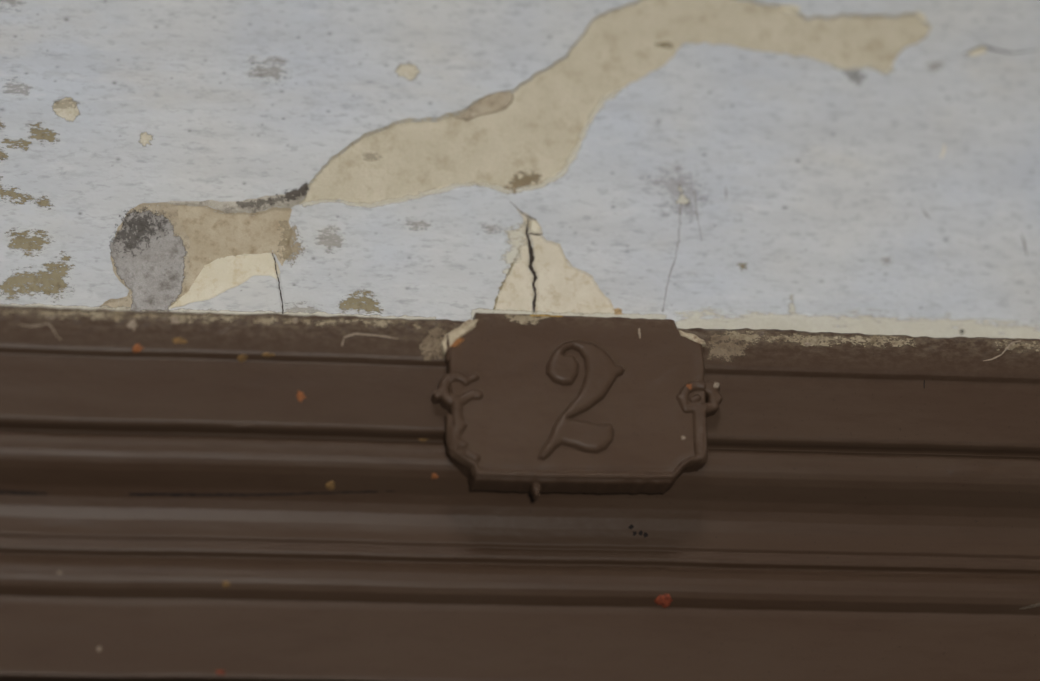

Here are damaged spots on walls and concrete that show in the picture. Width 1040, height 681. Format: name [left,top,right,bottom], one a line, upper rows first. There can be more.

peeling [52,97,79,122]
peeling [99,0,932,325]